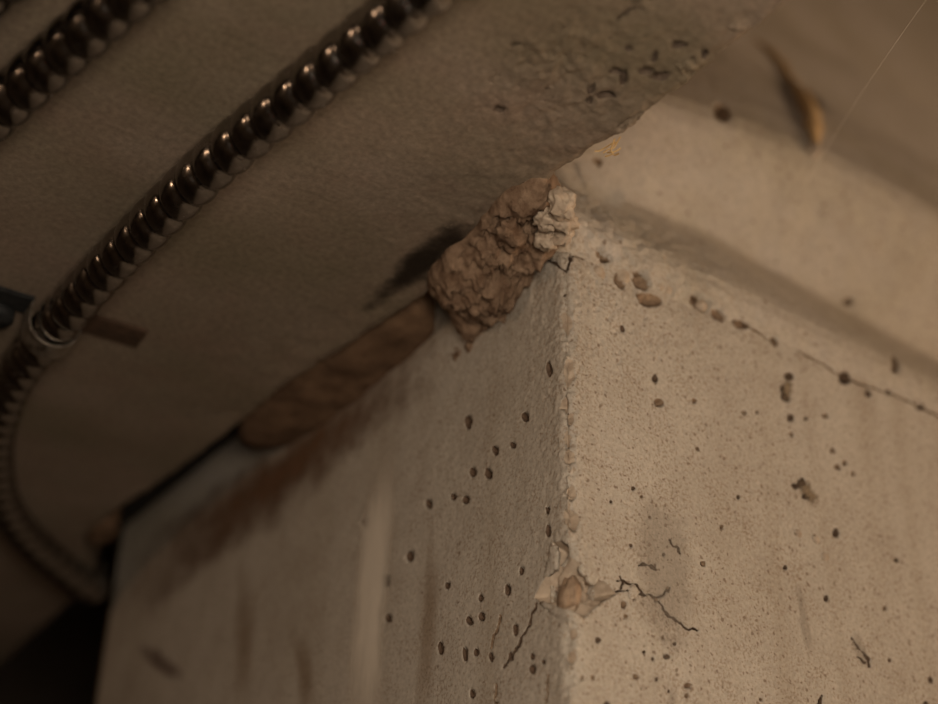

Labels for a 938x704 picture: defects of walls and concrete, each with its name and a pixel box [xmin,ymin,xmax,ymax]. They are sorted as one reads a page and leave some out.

spalling [609,110,645,135]
crack [548,252,938,417]
crack [615,562,698,632]
crack [490,602,538,704]